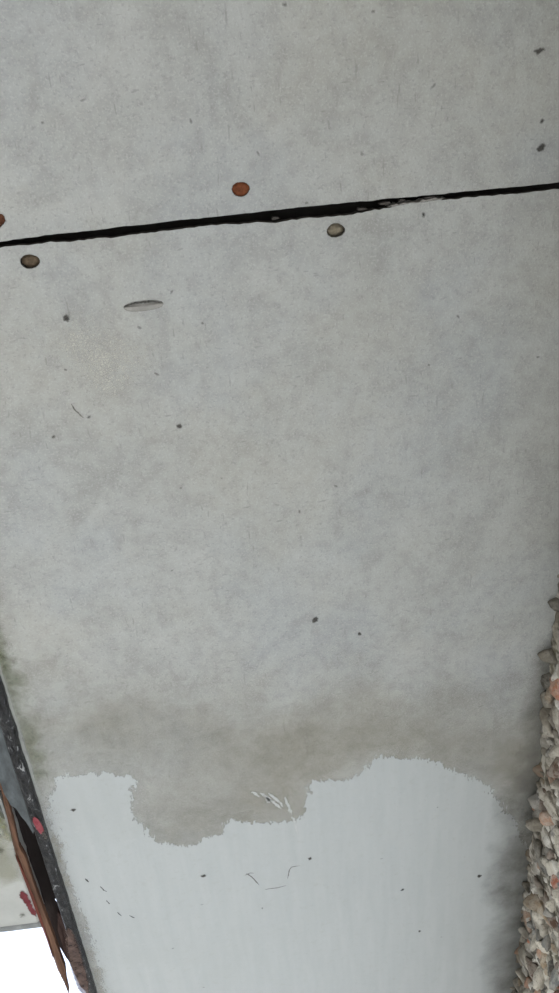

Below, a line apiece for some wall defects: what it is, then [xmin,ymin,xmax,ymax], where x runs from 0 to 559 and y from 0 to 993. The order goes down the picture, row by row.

leakage [503,808,533,989]